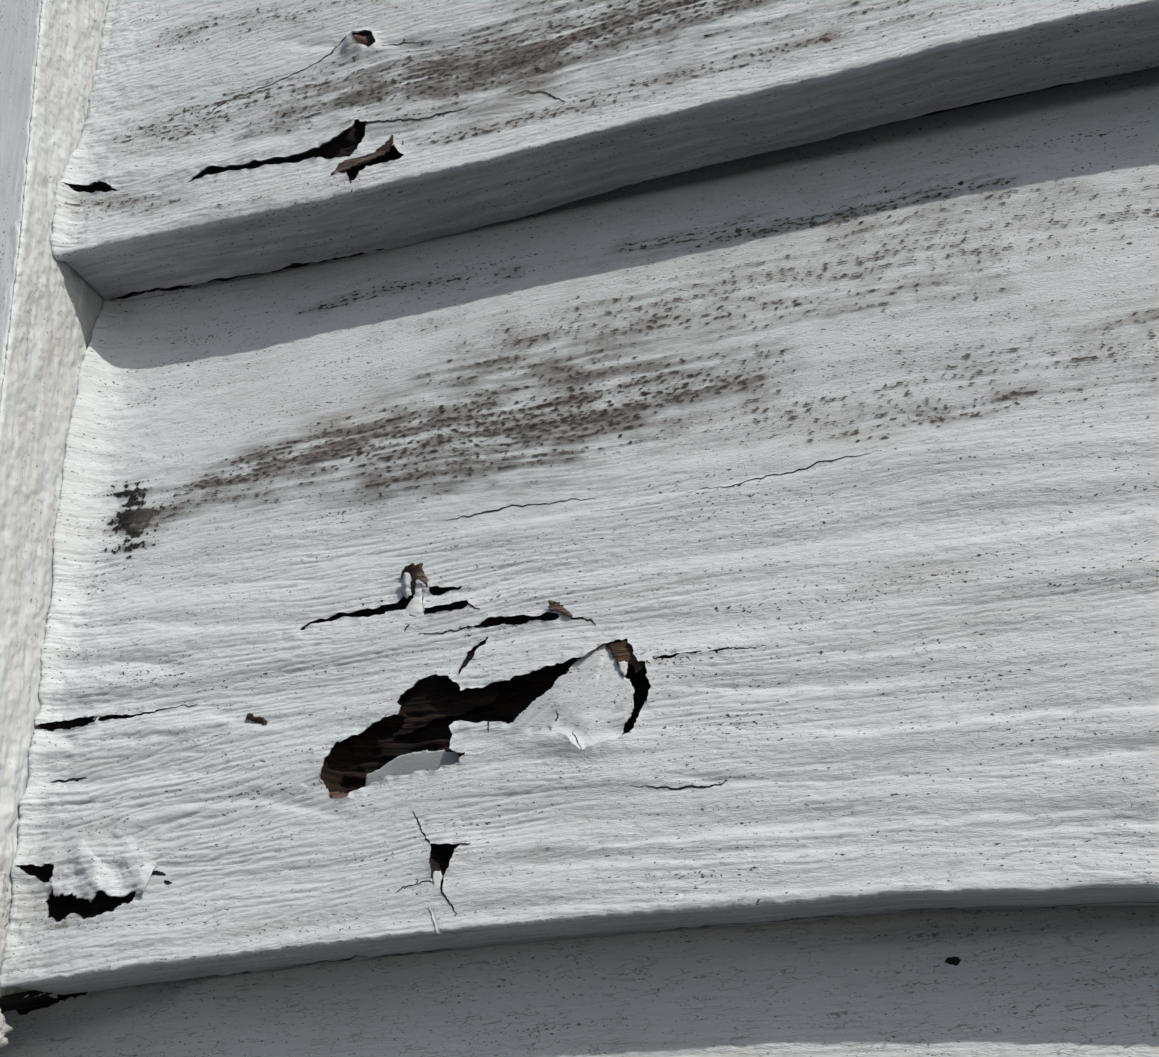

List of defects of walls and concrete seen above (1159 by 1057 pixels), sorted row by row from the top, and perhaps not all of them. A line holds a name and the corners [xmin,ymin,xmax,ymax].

mould [66,192,196,216]
peeling [331,135,404,184]
mould [95,165,1159,567]
crack [35,704,197,732]
peeling [319,638,658,799]
peeling [15,829,172,927]
peeling [396,811,470,914]